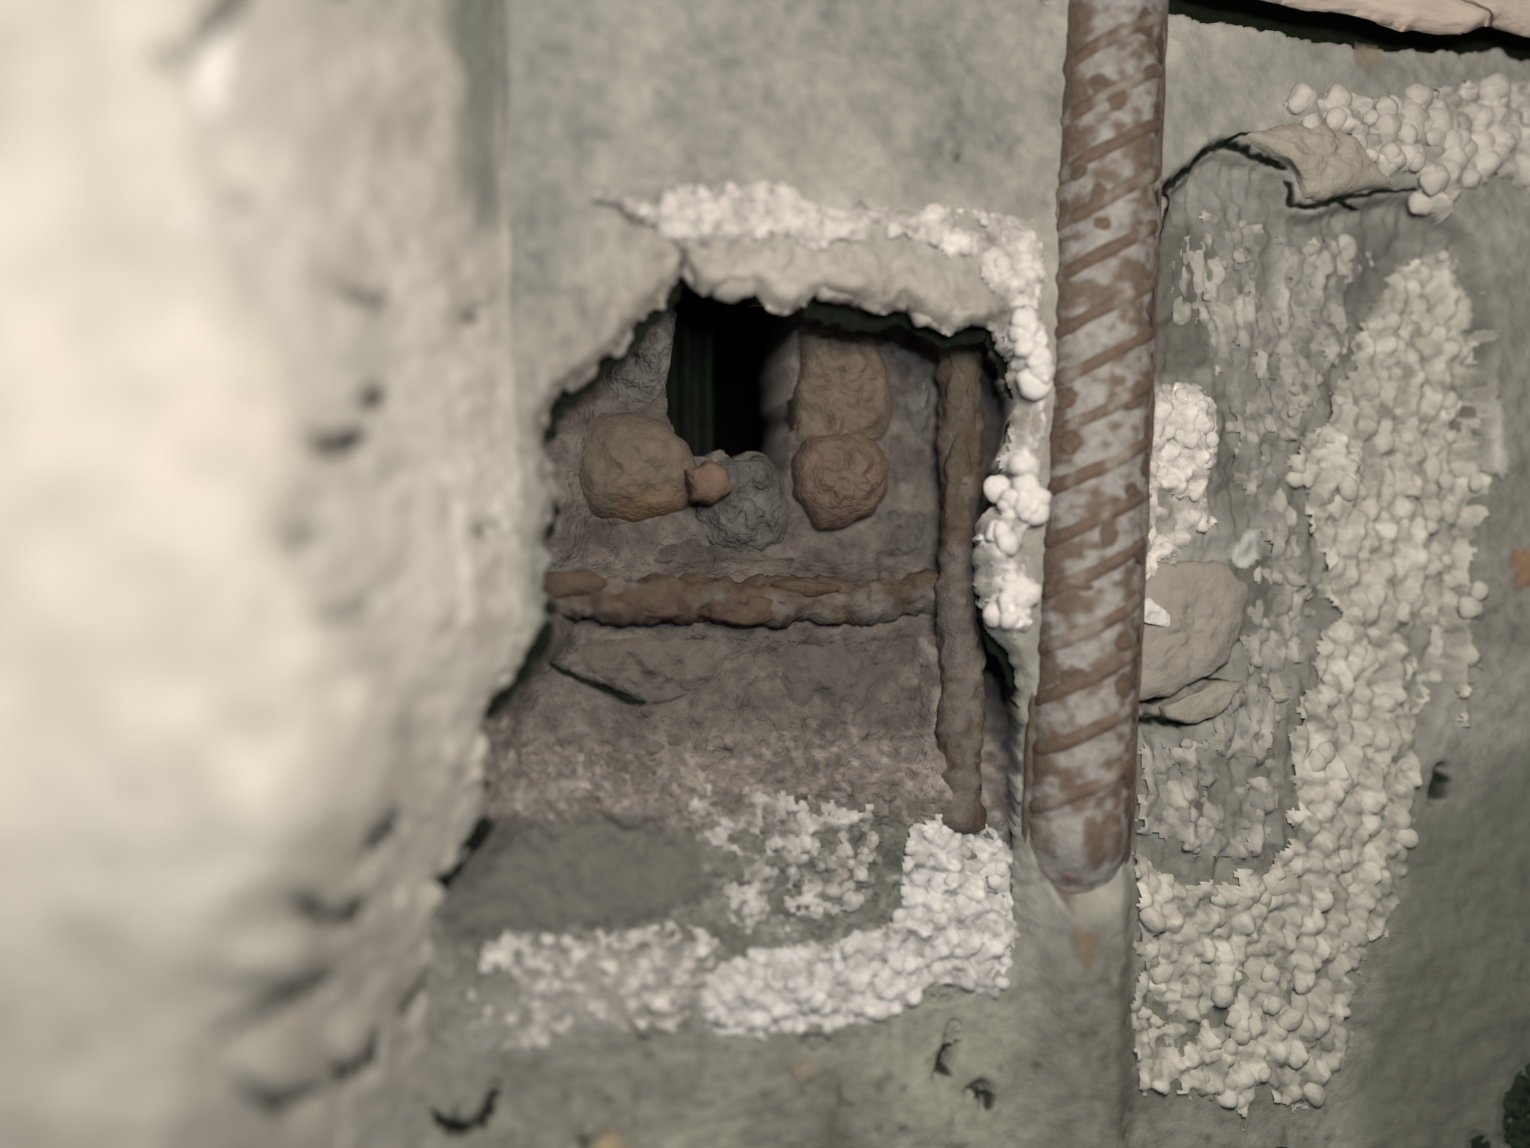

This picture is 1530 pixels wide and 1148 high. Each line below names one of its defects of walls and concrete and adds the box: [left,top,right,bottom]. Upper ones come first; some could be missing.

rust [1089,74,1128,111]
crack [1158,132,1417,258]
spalling [681,231,796,303]
spalling [815,287,855,304]
leakage [593,180,1055,639]
rust [1056,387,1077,410]
rust [1125,399,1150,496]
leakage [1131,72,1530,1148]
spalling [463,651,524,794]
crack [1138,697,1189,728]
spalling [418,841,457,975]
leakage [447,717,1020,1051]